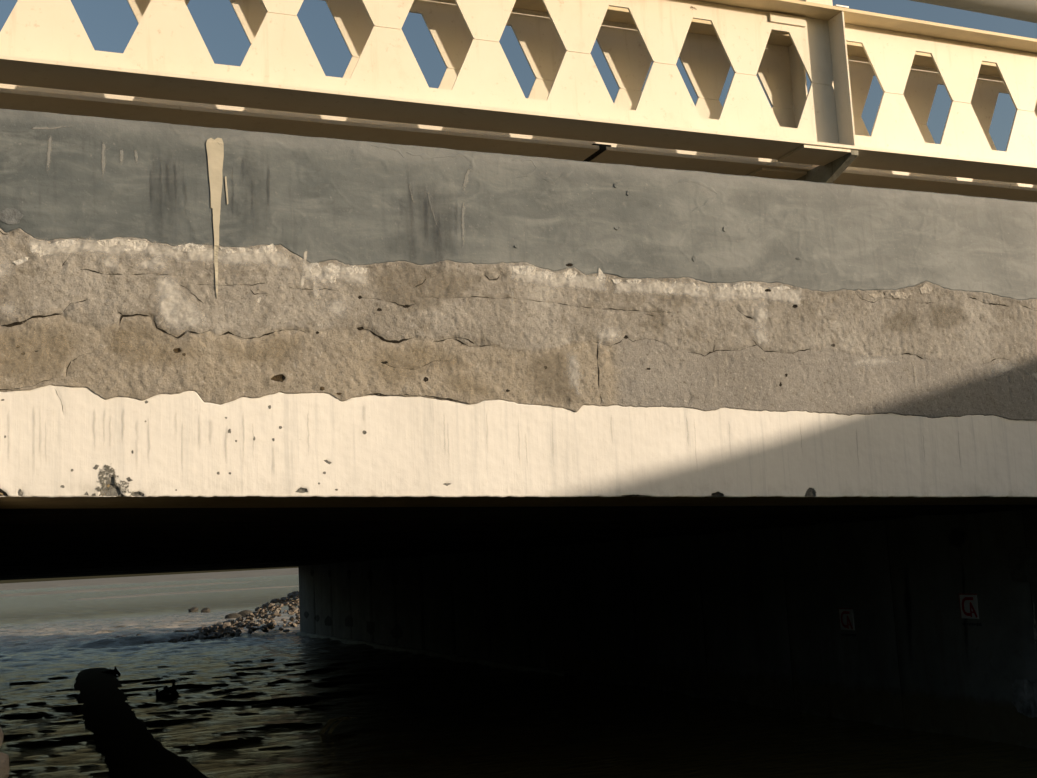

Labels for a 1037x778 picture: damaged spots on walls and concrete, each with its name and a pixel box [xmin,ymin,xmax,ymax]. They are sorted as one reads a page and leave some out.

peeling [12,239,77,265]
peeling [97,238,148,251]
peeling [172,243,207,252]
crack [63,255,264,304]
peeling [308,263,368,284]
peeling [512,263,577,280]
crack [0,300,86,327]
crack [118,312,304,339]
crack [358,273,674,402]
crack [688,310,817,356]
crack [0,352,93,414]
spalling [84,465,144,496]